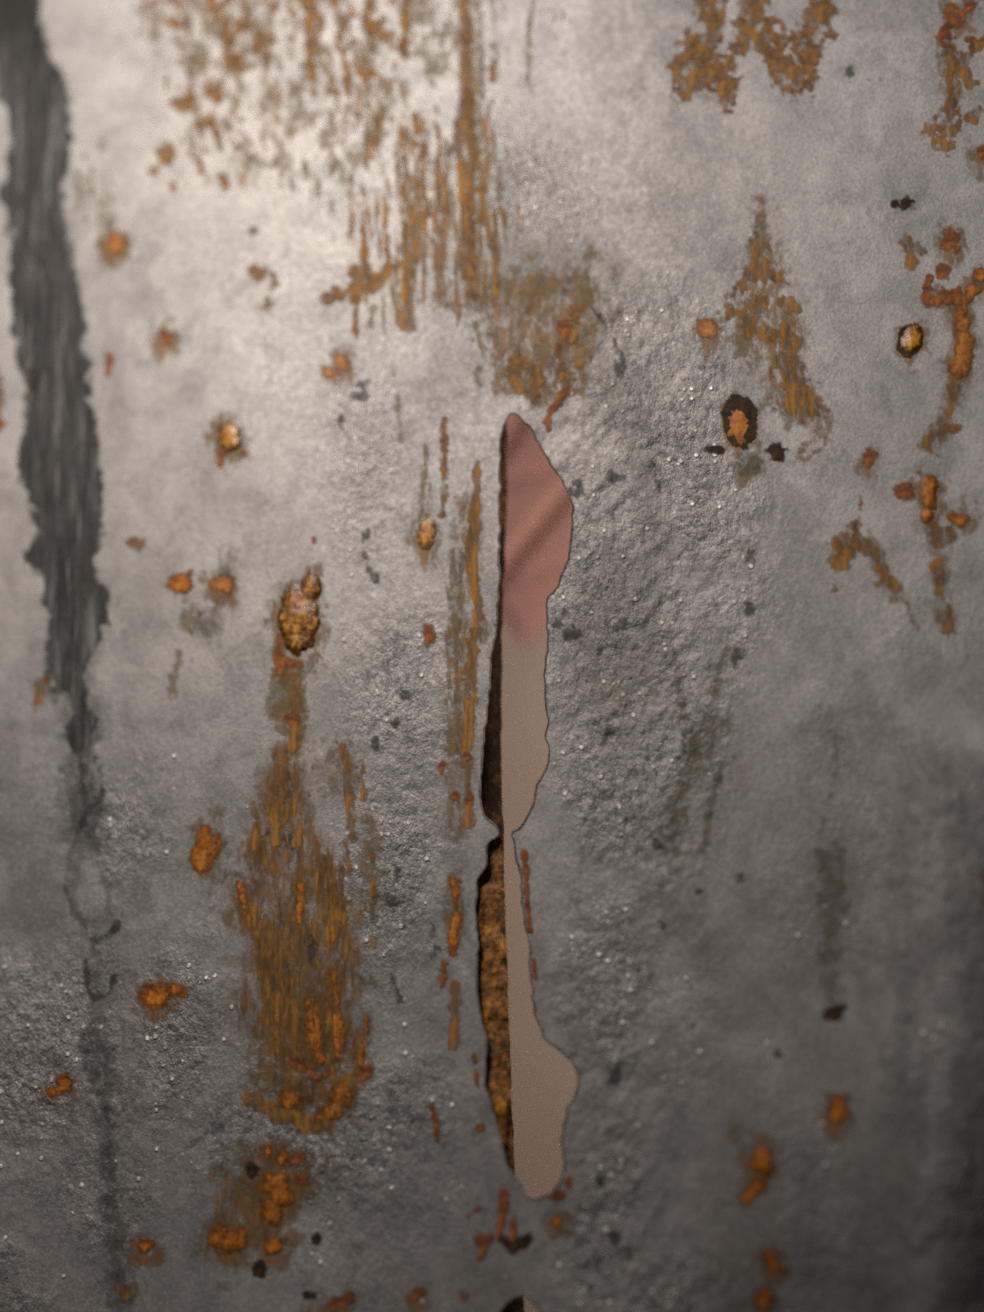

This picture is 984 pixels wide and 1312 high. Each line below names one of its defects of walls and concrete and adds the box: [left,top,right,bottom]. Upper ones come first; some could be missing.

rust [667,0,839,113]
rust [922,0,984,179]
rust [141,0,600,431]
rust [890,195,915,210]
rust [696,197,830,488]
rust [896,227,984,456]
rust [408,417,487,836]
rust [828,500,915,623]
rust [892,474,976,633]
rust [189,565,387,1134]
peeling [492,1090,509,1146]
rust [207,1140,322,1278]